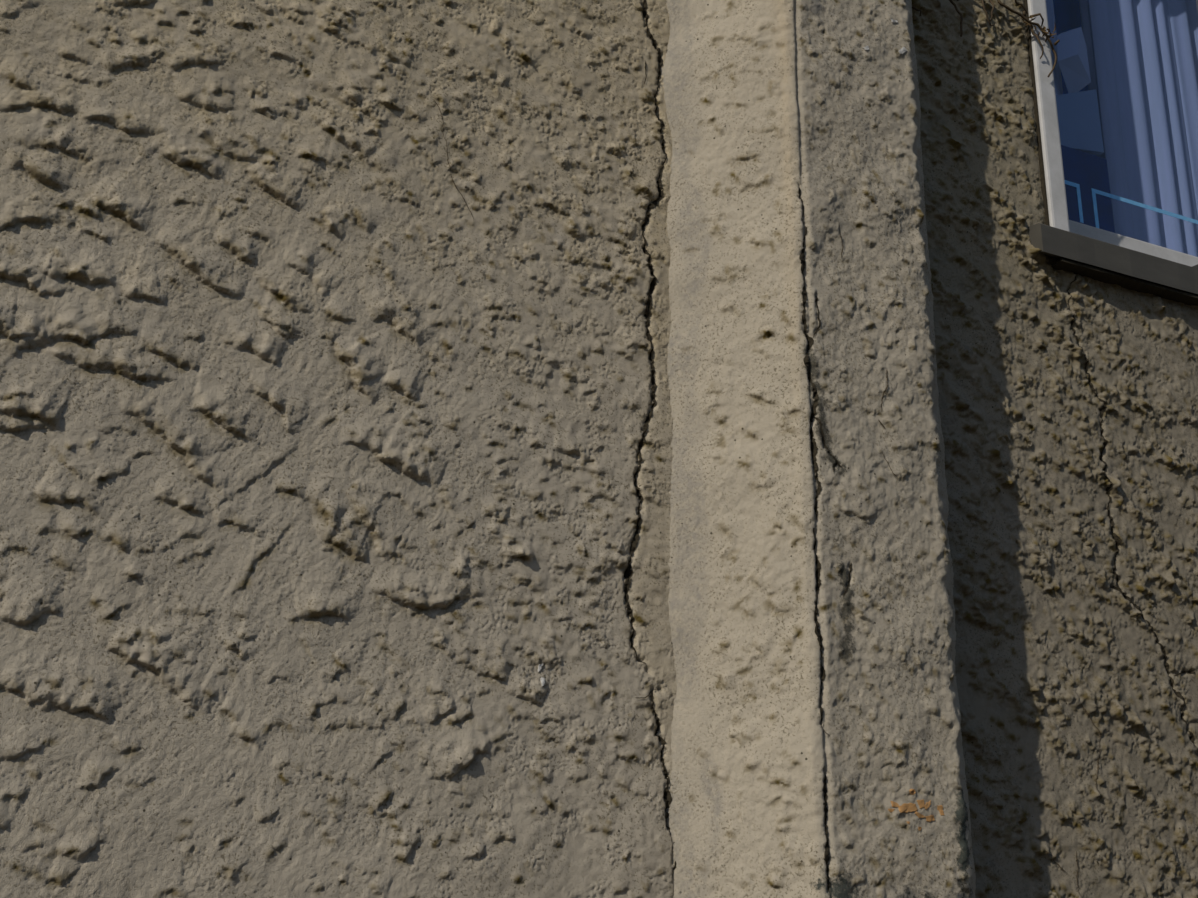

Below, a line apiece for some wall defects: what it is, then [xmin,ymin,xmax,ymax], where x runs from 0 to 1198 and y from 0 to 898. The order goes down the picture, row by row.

crack [624,0,677,880]
crack [798,187,852,735]
crack [1067,272,1198,755]
crack [1081,704,1102,790]
crack [822,772,830,893]
rust [888,789,945,831]
crack [1046,851,1082,897]